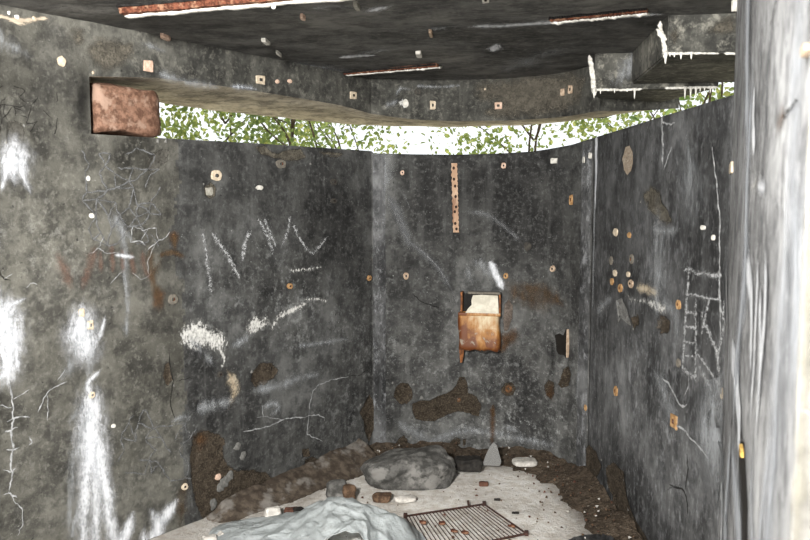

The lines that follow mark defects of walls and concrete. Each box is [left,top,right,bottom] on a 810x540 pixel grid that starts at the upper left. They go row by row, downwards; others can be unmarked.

corrosion [451,163,459,232]